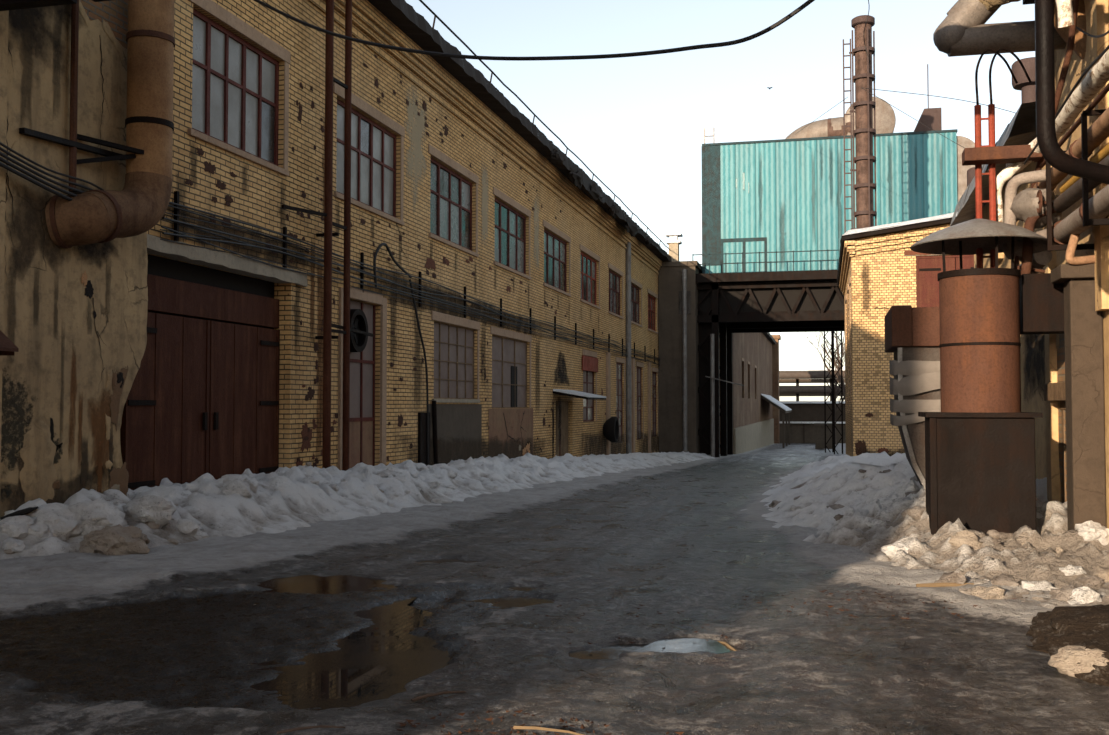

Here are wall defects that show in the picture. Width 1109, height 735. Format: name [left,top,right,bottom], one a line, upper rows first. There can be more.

damp [0,368,34,511]
damp [50,433,63,464]
damp [46,441,108,504]